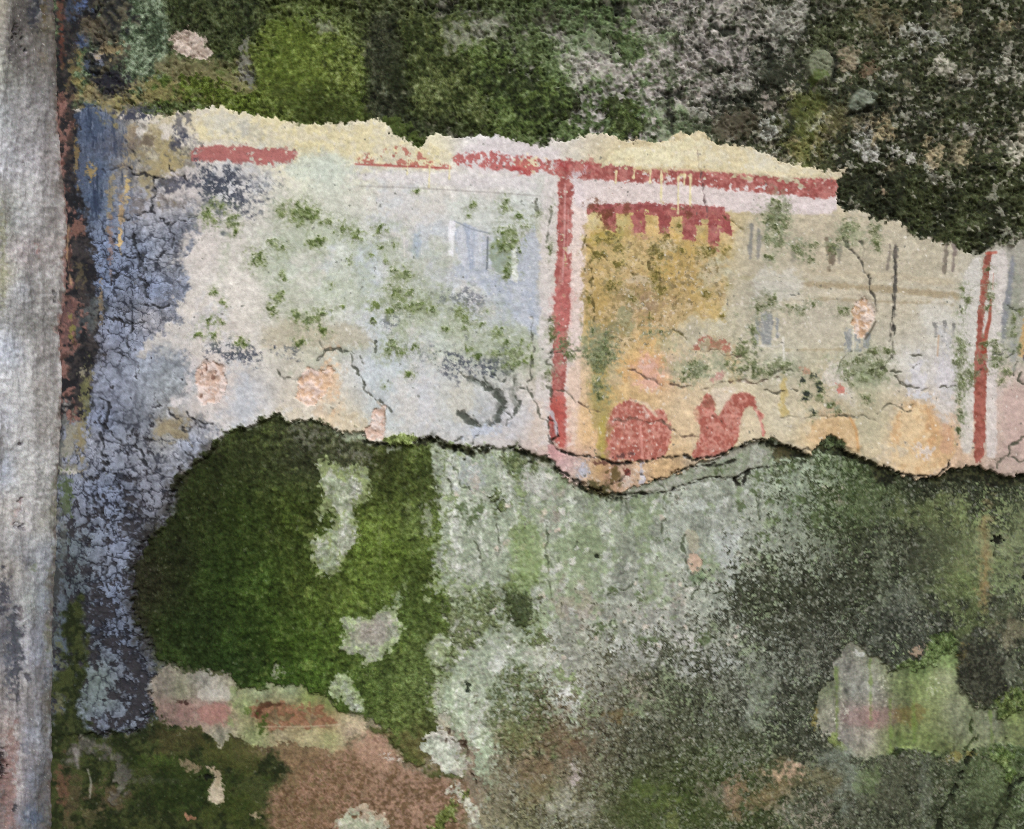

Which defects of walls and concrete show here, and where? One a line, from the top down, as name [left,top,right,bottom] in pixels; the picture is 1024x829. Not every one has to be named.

flaking render [169,27,214,60]
flaking render [834,0,974,87]
flaking render [850,112,978,185]
crack [843,238,950,413]
crack [51,97,214,739]
crack [447,331,811,521]
spalling [578,440,897,503]
crack [807,412,856,420]
crack [896,462,951,479]
crack [996,437,1024,470]
flaking render [814,641,1024,761]
flaking render [206,766,225,805]